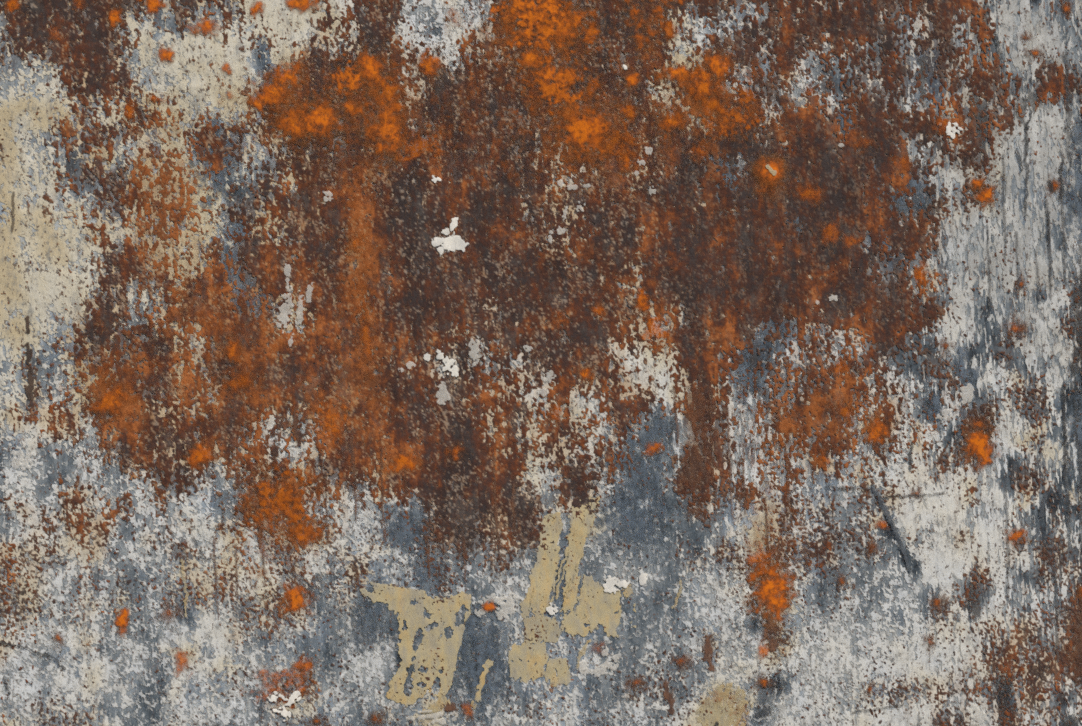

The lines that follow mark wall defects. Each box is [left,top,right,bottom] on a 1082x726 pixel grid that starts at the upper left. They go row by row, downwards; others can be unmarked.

peeling [418,161,479,296]
peeling [468,103,616,284]
corrosion [1049,268,1082,378]
corrosion [196,659,255,701]